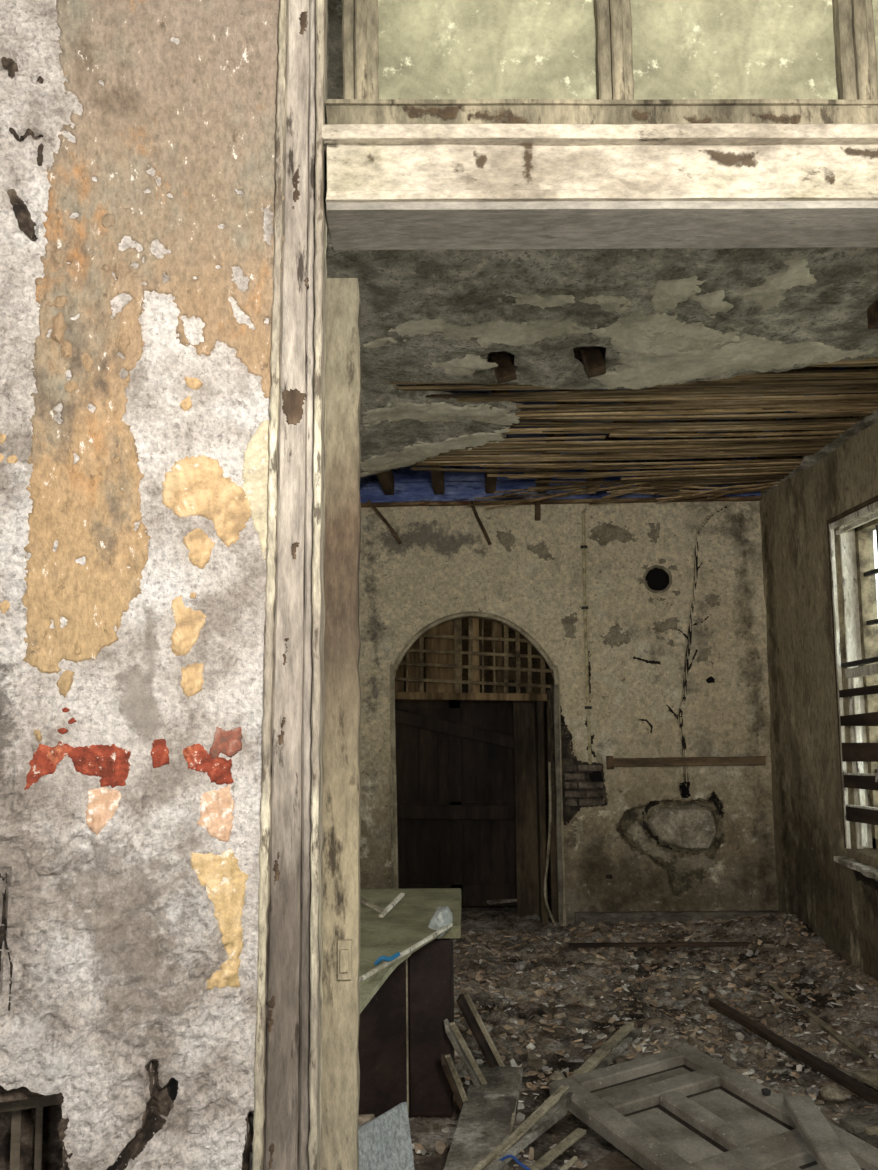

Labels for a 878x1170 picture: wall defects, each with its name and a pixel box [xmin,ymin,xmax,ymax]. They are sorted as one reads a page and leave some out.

peeling [0,0,308,674]
peeling [363,259,874,390]
peeling [360,402,520,477]
flaking render [496,530,555,561]
flaking render [589,521,661,548]
peeling [170,592,206,697]
flaking render [599,623,631,648]
crack [633,505,730,783]
flaking render [548,651,725,899]
crack [0,872,13,1011]
spalling [0,1085,73,1170]
flaking render [242,1111,254,1170]